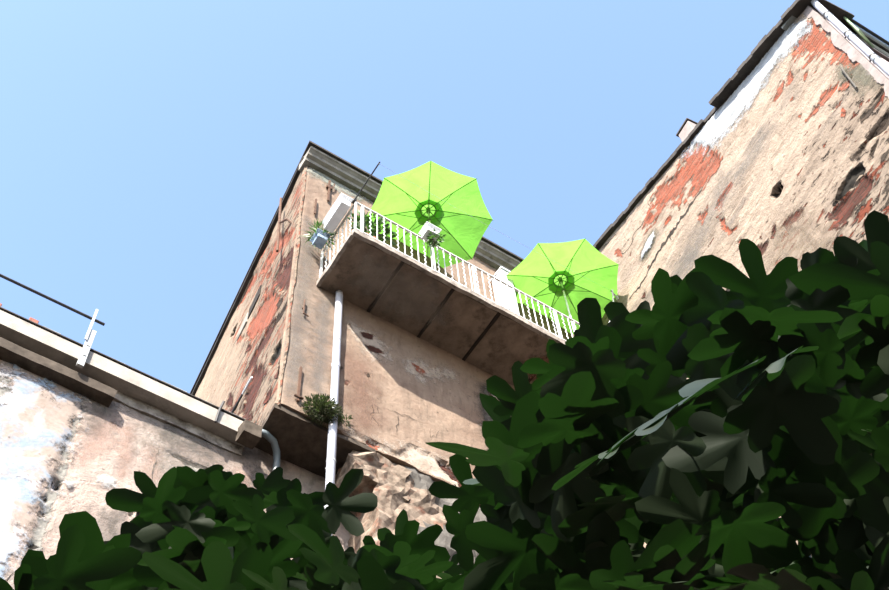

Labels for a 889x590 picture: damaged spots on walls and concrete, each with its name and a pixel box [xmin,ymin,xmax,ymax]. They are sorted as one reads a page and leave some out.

flaking render [773,18,859,122]
crack [605,204,650,257]
crack [629,171,716,299]
flaking render [640,140,726,259]
flaking render [697,181,741,243]
flaking render [757,206,804,254]
flaking render [825,87,889,230]
flaking render [225,225,297,421]
flaking render [0,376,13,406]
spalling [335,425,462,497]